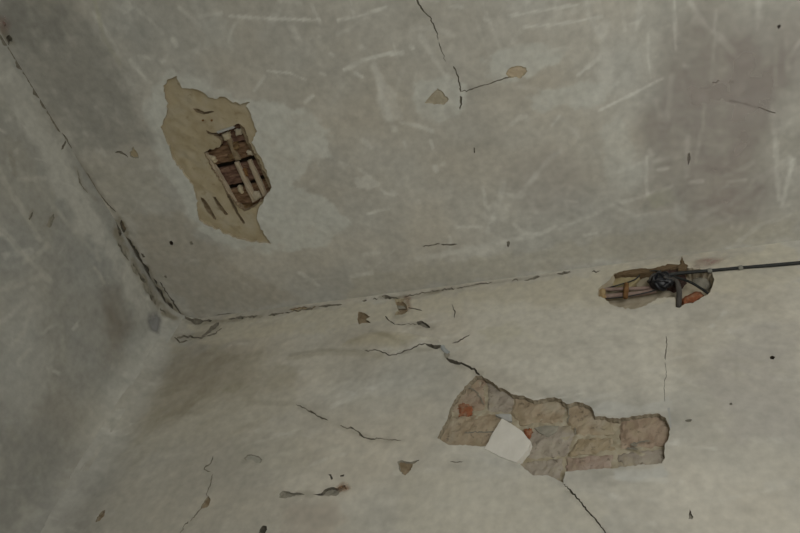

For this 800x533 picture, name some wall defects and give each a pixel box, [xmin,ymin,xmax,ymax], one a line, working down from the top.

crack [416,0,511,109]
spalling [425,88,449,105]
spalling [161,76,272,244]
spalling [598,264,714,309]
spalling [357,312,370,324]
crack [365,335,480,375]
crack [296,404,401,441]
spalling [438,376,670,483]
spalling [315,474,347,497]
spalling [397,460,419,475]
crack [564,484,606,533]